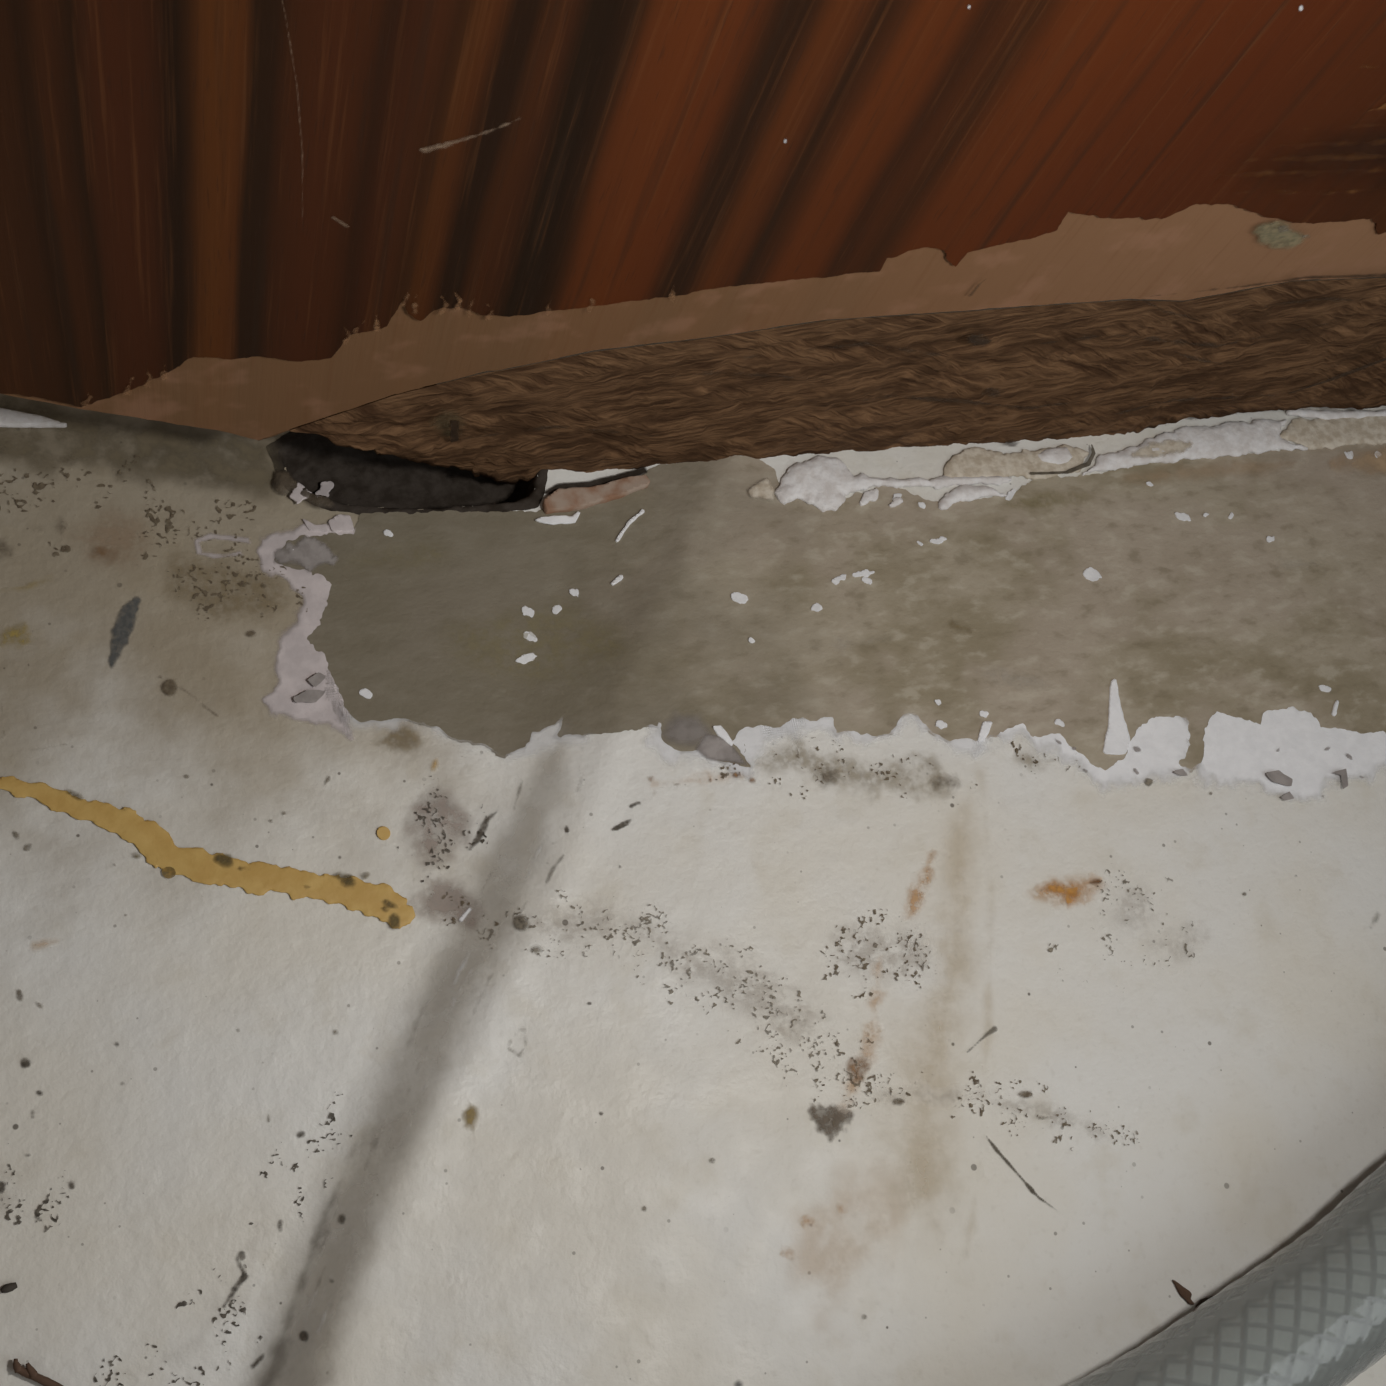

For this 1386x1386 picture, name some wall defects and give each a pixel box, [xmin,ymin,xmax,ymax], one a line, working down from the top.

peeling [258,431,1386,801]
water stain [769,736,854,799]
rust [1040,880,1101,904]
water stain [1097,869,1167,940]
water stain [820,909,931,999]
water stain [867,1074,911,1116]
water stain [951,1071,1073,1150]
water stain [1088,1110,1138,1146]